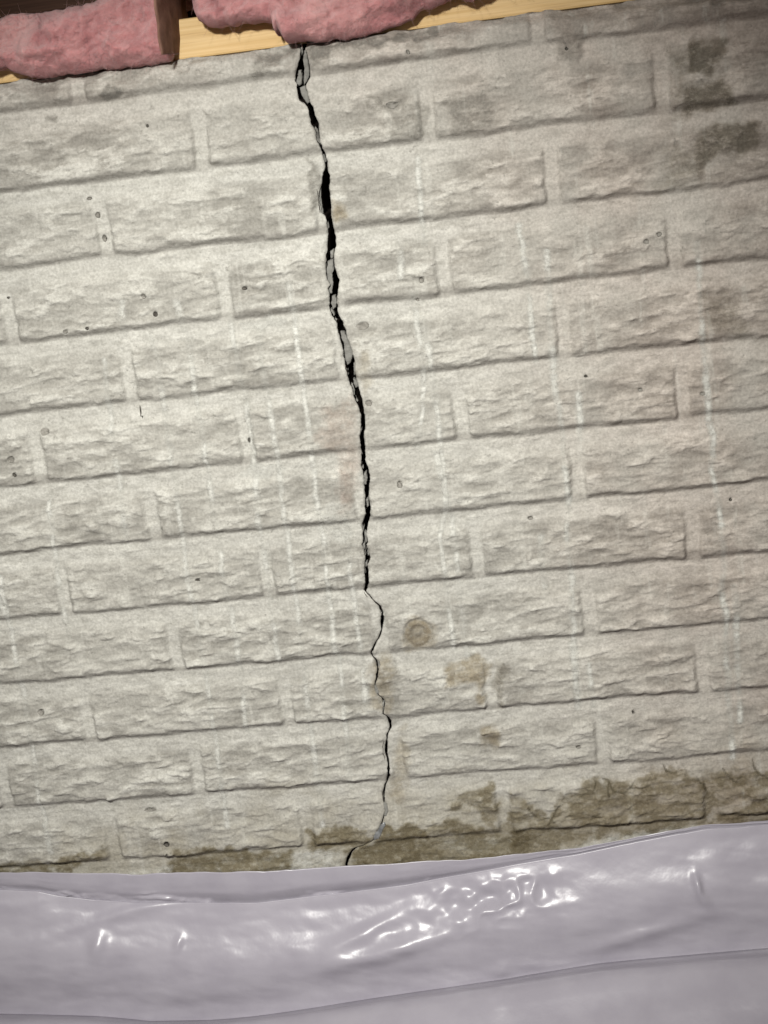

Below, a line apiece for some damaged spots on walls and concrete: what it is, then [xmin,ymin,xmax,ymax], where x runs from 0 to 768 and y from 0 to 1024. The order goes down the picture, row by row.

water stain [241,400,301,623]
crack [295,44,392,866]
water stain [259,852,339,871]